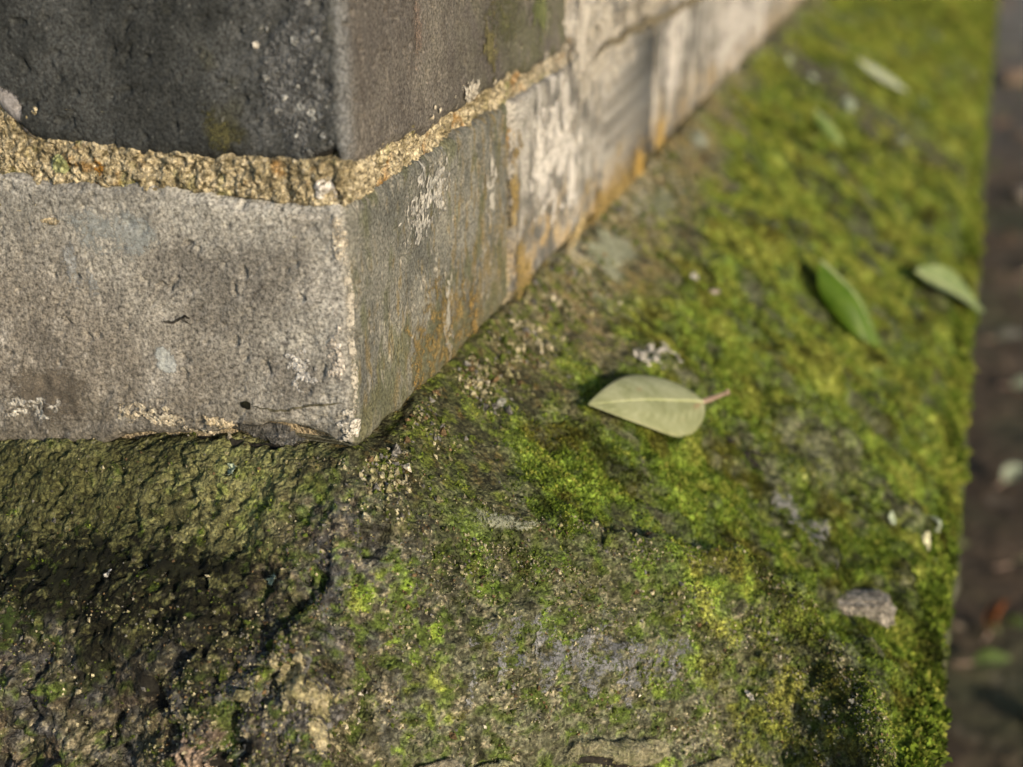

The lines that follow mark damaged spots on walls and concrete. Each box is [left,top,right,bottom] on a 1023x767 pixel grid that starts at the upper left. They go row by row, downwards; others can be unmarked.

leakage [391,146,454,248]
leakage [486,139,497,226]
leakage [439,272,454,372]